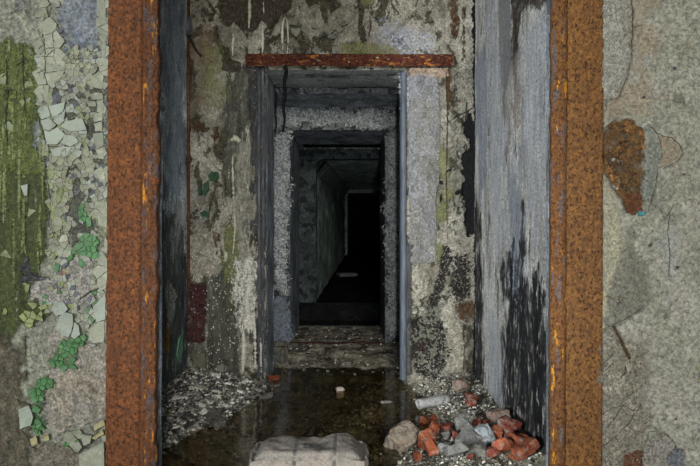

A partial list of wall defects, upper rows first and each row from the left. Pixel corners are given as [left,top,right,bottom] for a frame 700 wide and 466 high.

peeling [16,0,109,466]
damp [471,0,546,455]
crack [605,3,640,109]
corrosion [603,119,646,215]